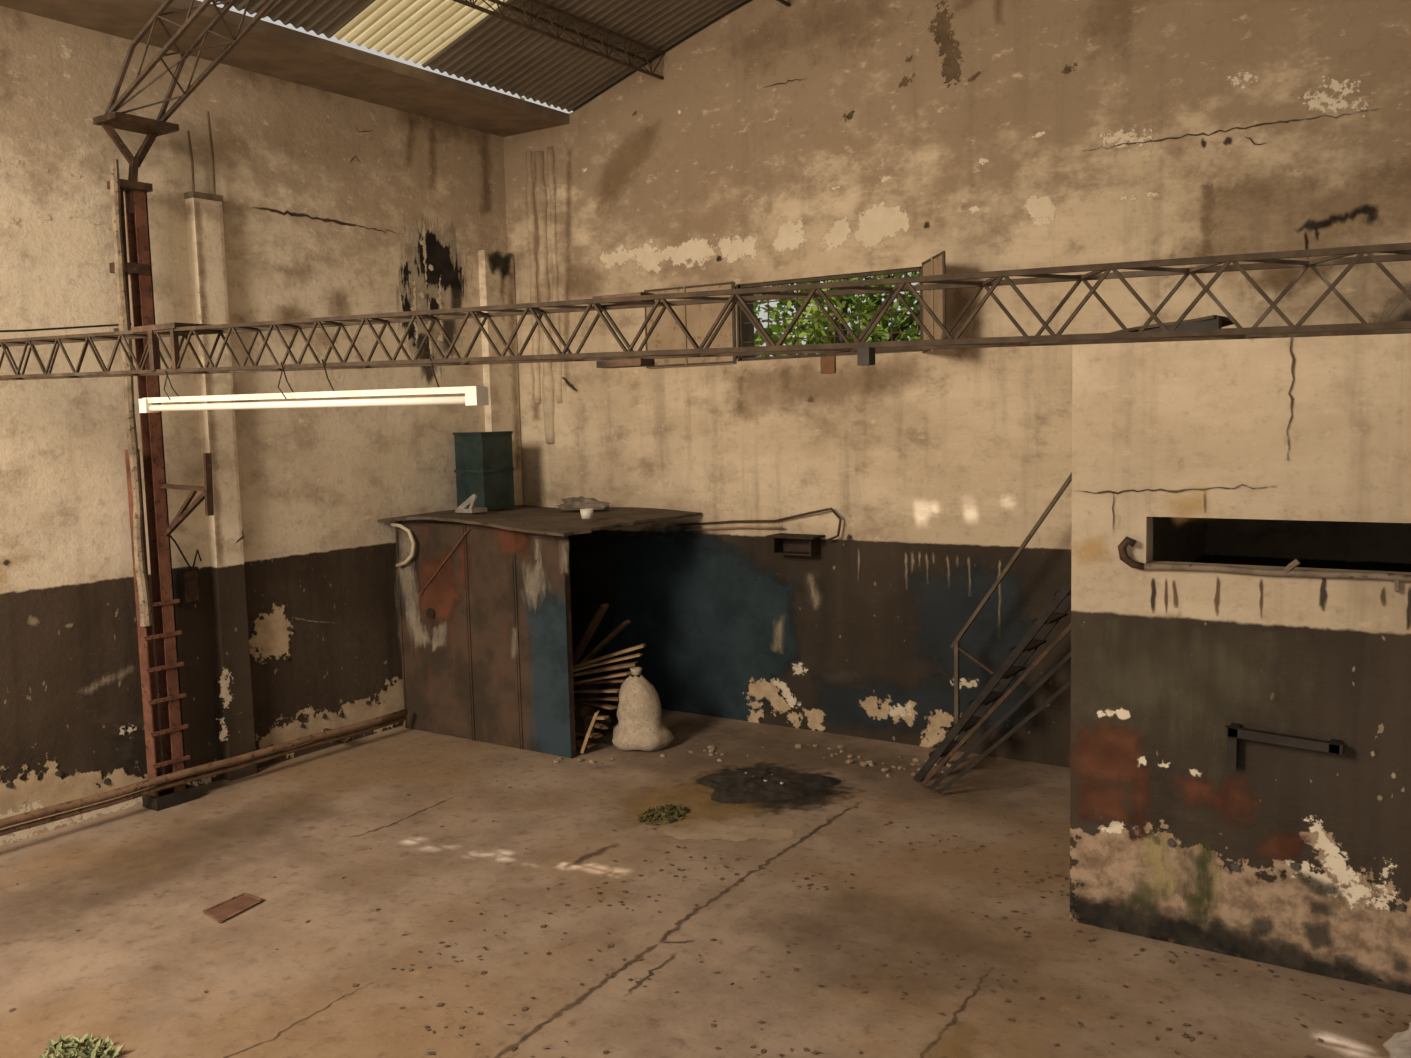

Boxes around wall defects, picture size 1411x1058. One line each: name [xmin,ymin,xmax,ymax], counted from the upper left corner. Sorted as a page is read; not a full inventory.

crack [1084,110,1367,151]
peeling [590,201,929,274]
damp [1299,205,1377,250]
peeling [396,216,466,382]
peeling [249,603,318,664]
peeling [255,676,405,759]
peeling [743,662,826,732]
peeling [859,690,962,748]
peeling [0,725,149,846]
crack [495,809,849,1058]
peeling [1070,815,1411,985]
crack [920,978,982,1058]